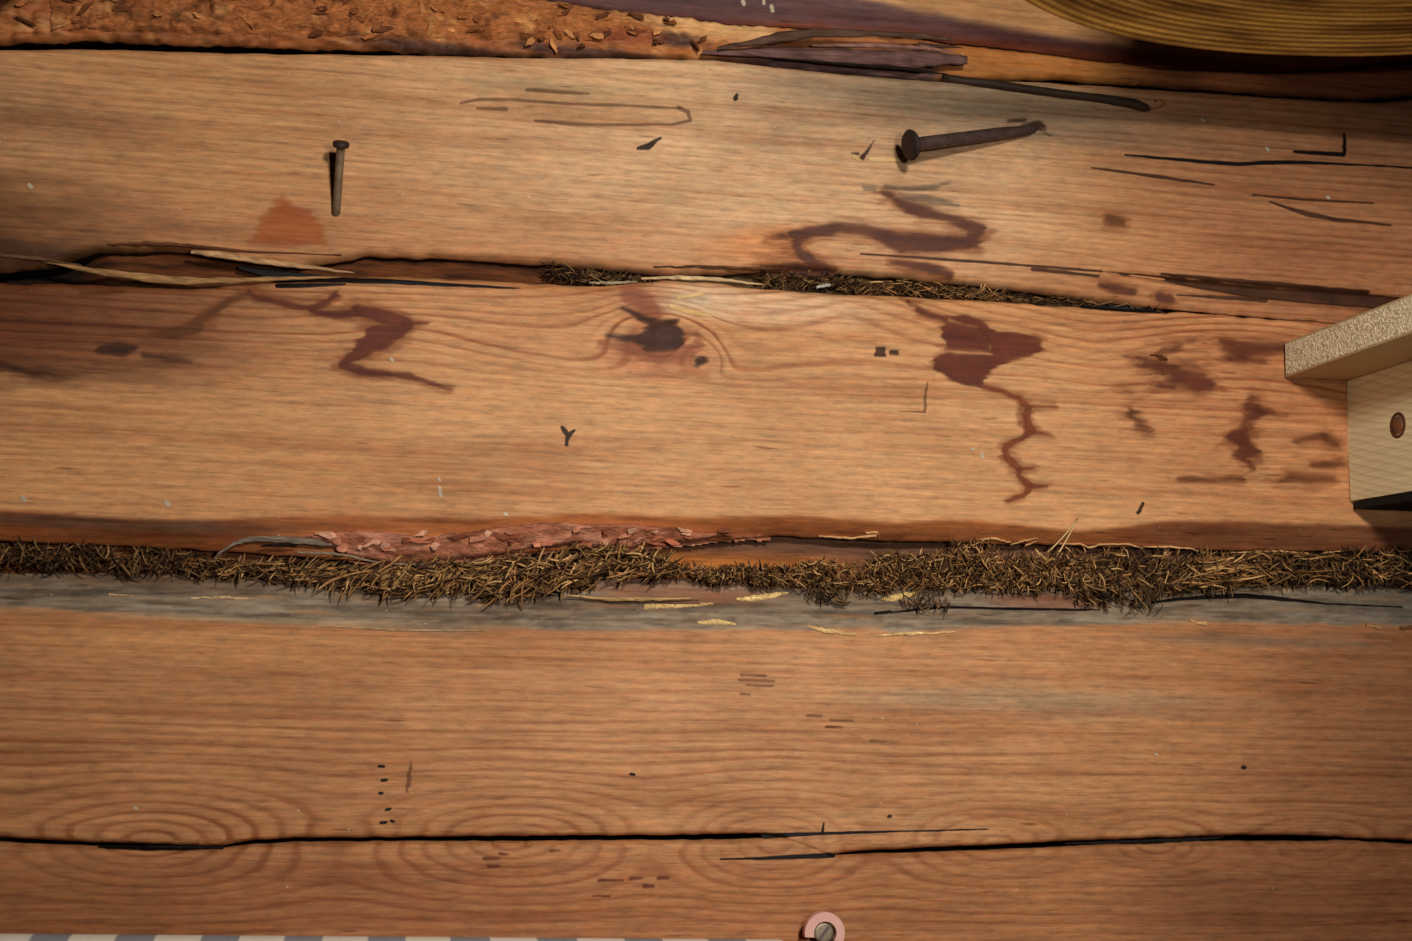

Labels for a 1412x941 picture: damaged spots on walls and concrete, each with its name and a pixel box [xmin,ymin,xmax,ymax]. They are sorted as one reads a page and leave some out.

peeling [309,0,394,40]
peeling [514,8,677,54]
leakage [768,186,989,279]
crack [238,266,516,289]
crack [860,253,1402,313]
leakage [154,292,441,386]
leakage [906,300,1042,387]
leakage [1226,397,1266,480]
peeling [315,530,554,552]
peeling [572,527,698,547]
crack [874,606,1101,615]
crack [720,822,986,860]